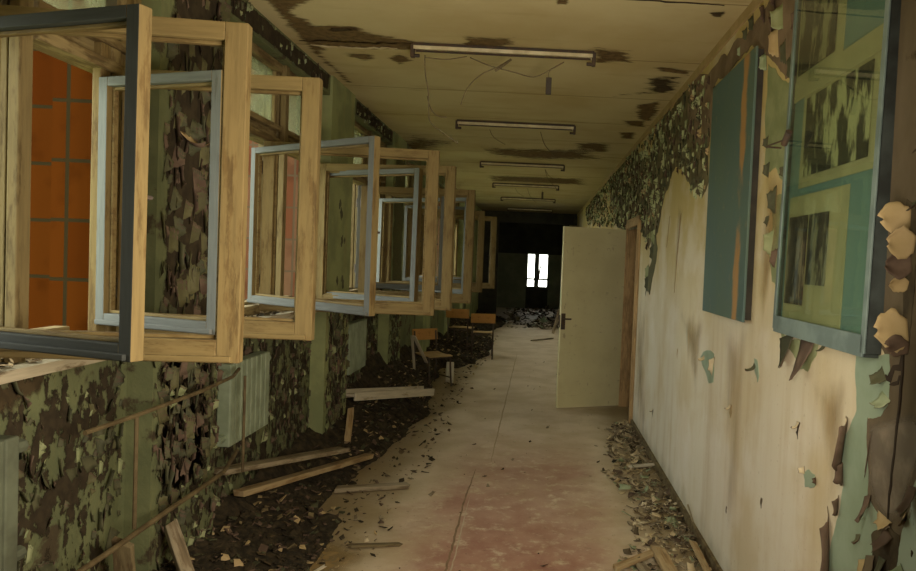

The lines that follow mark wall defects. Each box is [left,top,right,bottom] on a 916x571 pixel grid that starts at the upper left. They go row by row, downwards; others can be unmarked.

leakage [266,0,413,83]
leakage [463,37,510,47]
leakage [596,50,630,63]
leakage [619,67,688,139]
peeling [159,90,211,315]
leakage [492,176,582,185]
leakage [486,143,609,160]
peeling [819,0,916,571]
peeling [778,334,825,381]
peeling [1,360,126,571]
peeling [150,338,312,571]
peeling [797,467,816,488]